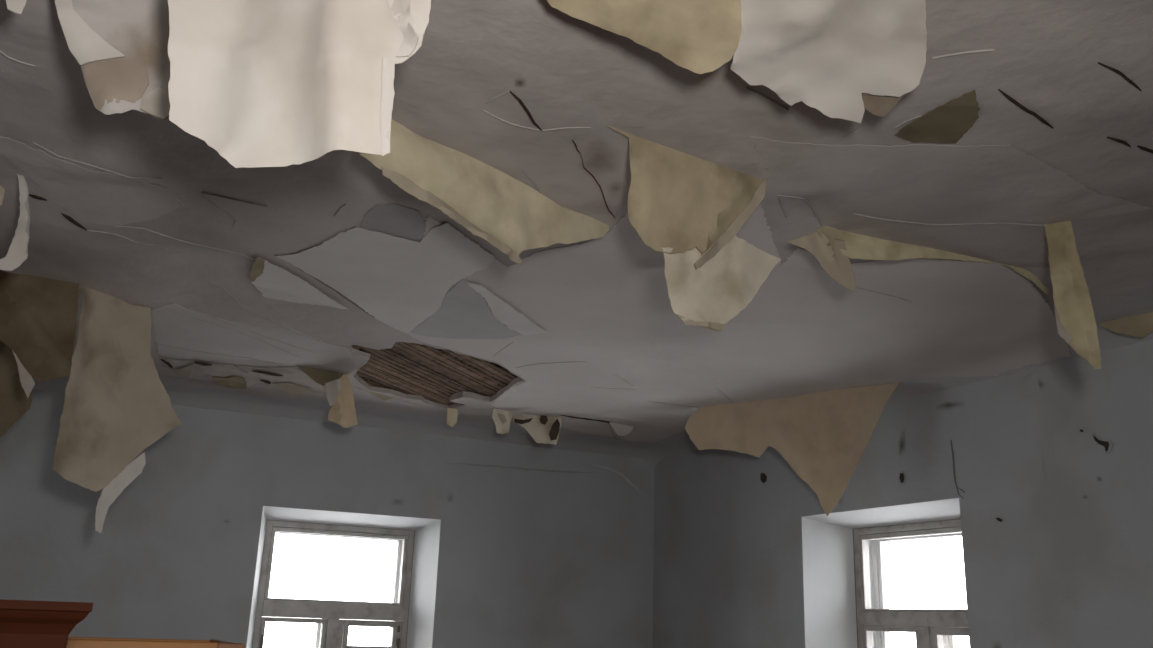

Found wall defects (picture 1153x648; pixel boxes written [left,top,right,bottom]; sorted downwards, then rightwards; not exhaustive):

crack [1098,62,1142,92]
crack [998,89,1053,128]
crack [33,142,163,179]
crack [483,90,615,218]
crack [1107,136,1153,153]
crack [29,192,375,318]
peeling [151,203,1071,443]
crack [161,359,283,384]